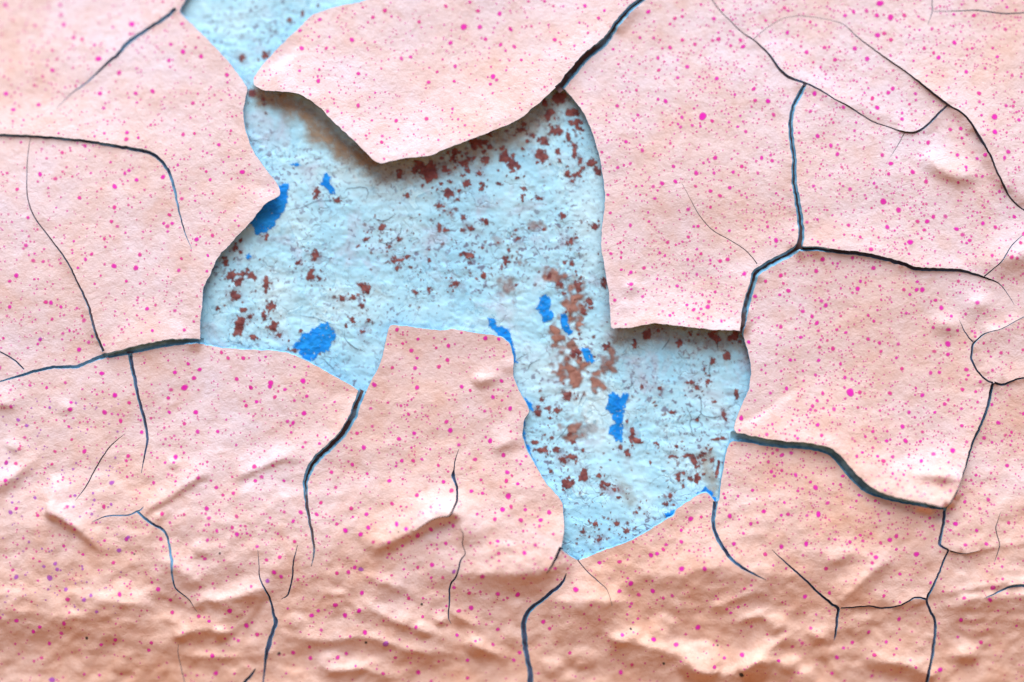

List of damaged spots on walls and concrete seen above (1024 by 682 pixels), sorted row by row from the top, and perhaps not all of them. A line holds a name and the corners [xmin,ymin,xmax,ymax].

rust [239,4,319,72]
crack [0,134,204,501]
rust [216,238,303,353]
crack [244,389,364,682]
rust [289,232,381,356]
peeling [0,0,803,593]
rust [349,92,743,550]
crack [522,547,612,682]
peeling [714,438,943,561]
crack [682,0,1024,682]
peeling [734,249,1002,507]
peeling [791,85,1024,276]